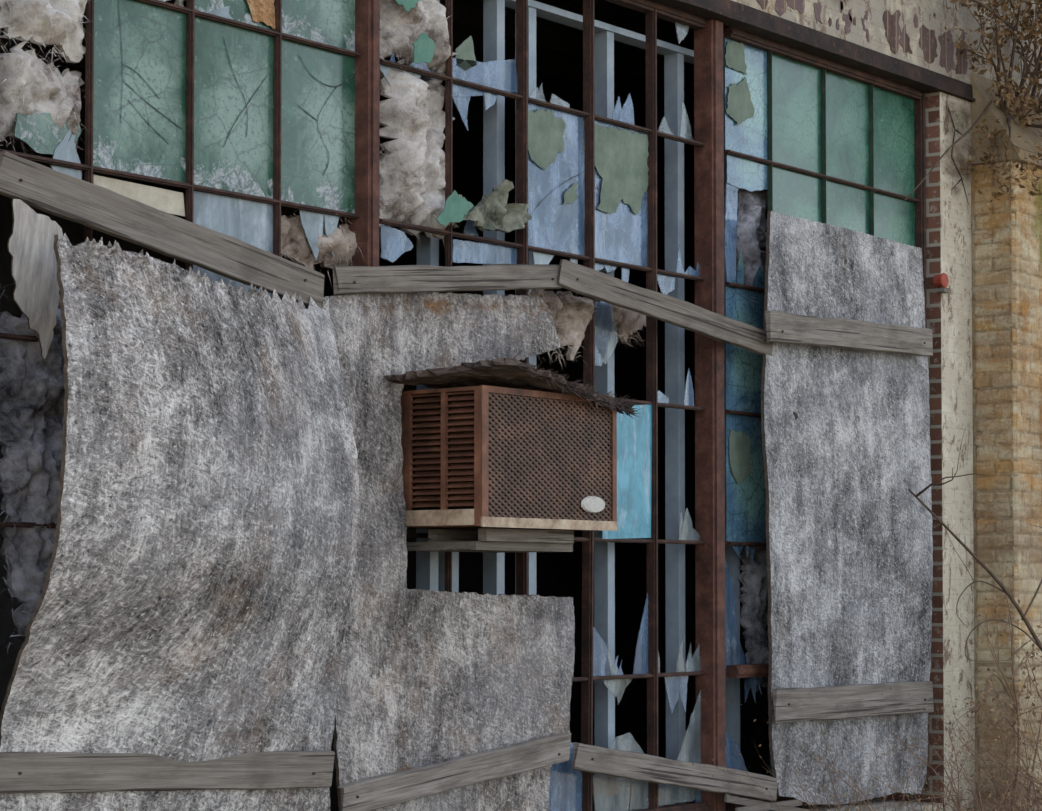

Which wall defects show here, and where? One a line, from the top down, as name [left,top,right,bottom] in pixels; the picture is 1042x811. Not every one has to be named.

peeling [757,0,870,43]
peeling [883,10,968,74]
peeling [724,40,755,126]